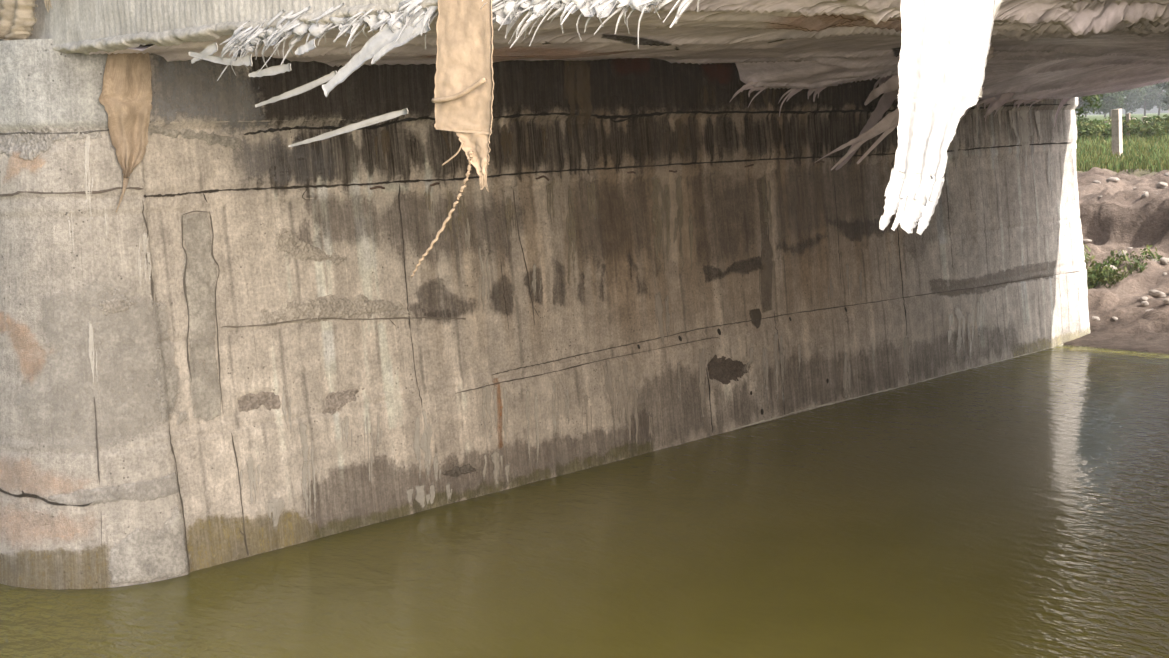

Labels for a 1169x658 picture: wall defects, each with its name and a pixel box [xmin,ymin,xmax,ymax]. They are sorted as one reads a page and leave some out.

crack [244,116,435,135]
crack [493,109,896,122]
water stain [953,99,1065,186]
crack [970,102,1071,110]
water stain [151,54,898,321]
crack [0,142,1081,572]
water stain [282,350,707,530]